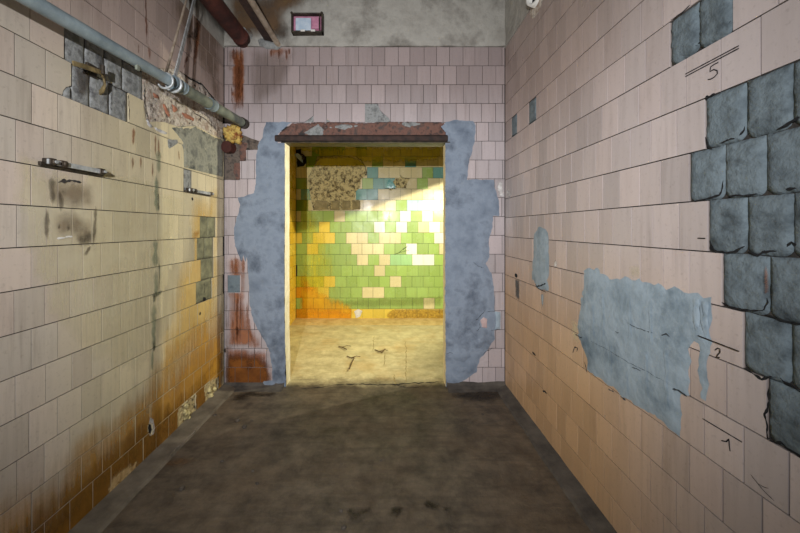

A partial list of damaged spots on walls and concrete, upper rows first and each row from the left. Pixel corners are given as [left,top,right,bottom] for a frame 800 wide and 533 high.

peeling [61,28,259,180]
corrosion [231,49,244,105]
peeling [671,0,733,65]
spalling [295,149,367,210]
peeling [195,217,215,315]
peeling [690,61,800,458]
corrosion [3,293,268,533]